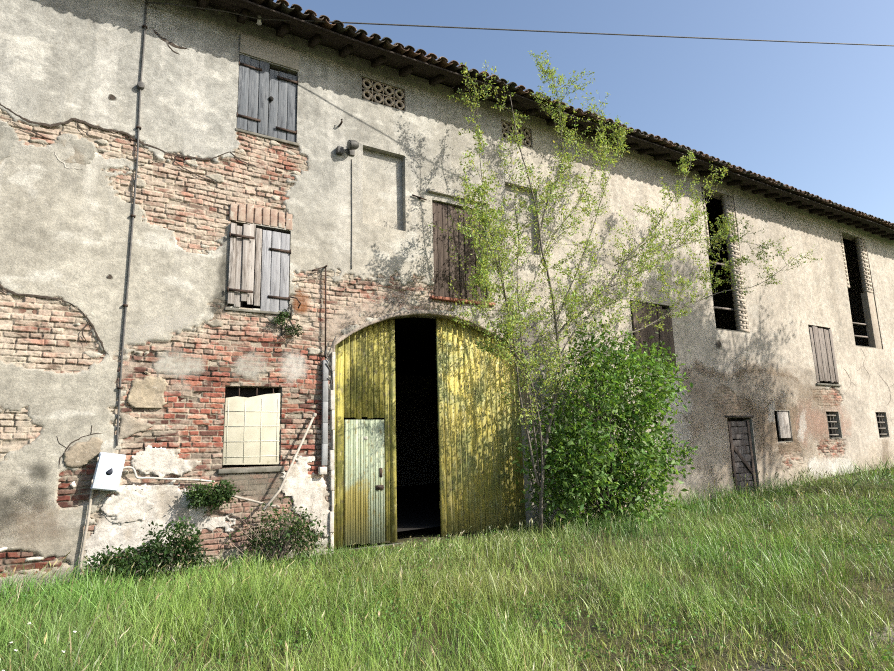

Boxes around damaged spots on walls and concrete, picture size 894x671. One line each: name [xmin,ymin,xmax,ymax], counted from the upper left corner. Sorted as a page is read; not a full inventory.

crack [152,28,187,54]
spalling [0,109,308,255]
spalling [0,269,462,568]
leakage [663,383,702,443]
spalling [816,437,846,460]
leakage [808,457,854,479]
spalling [0,547,70,577]